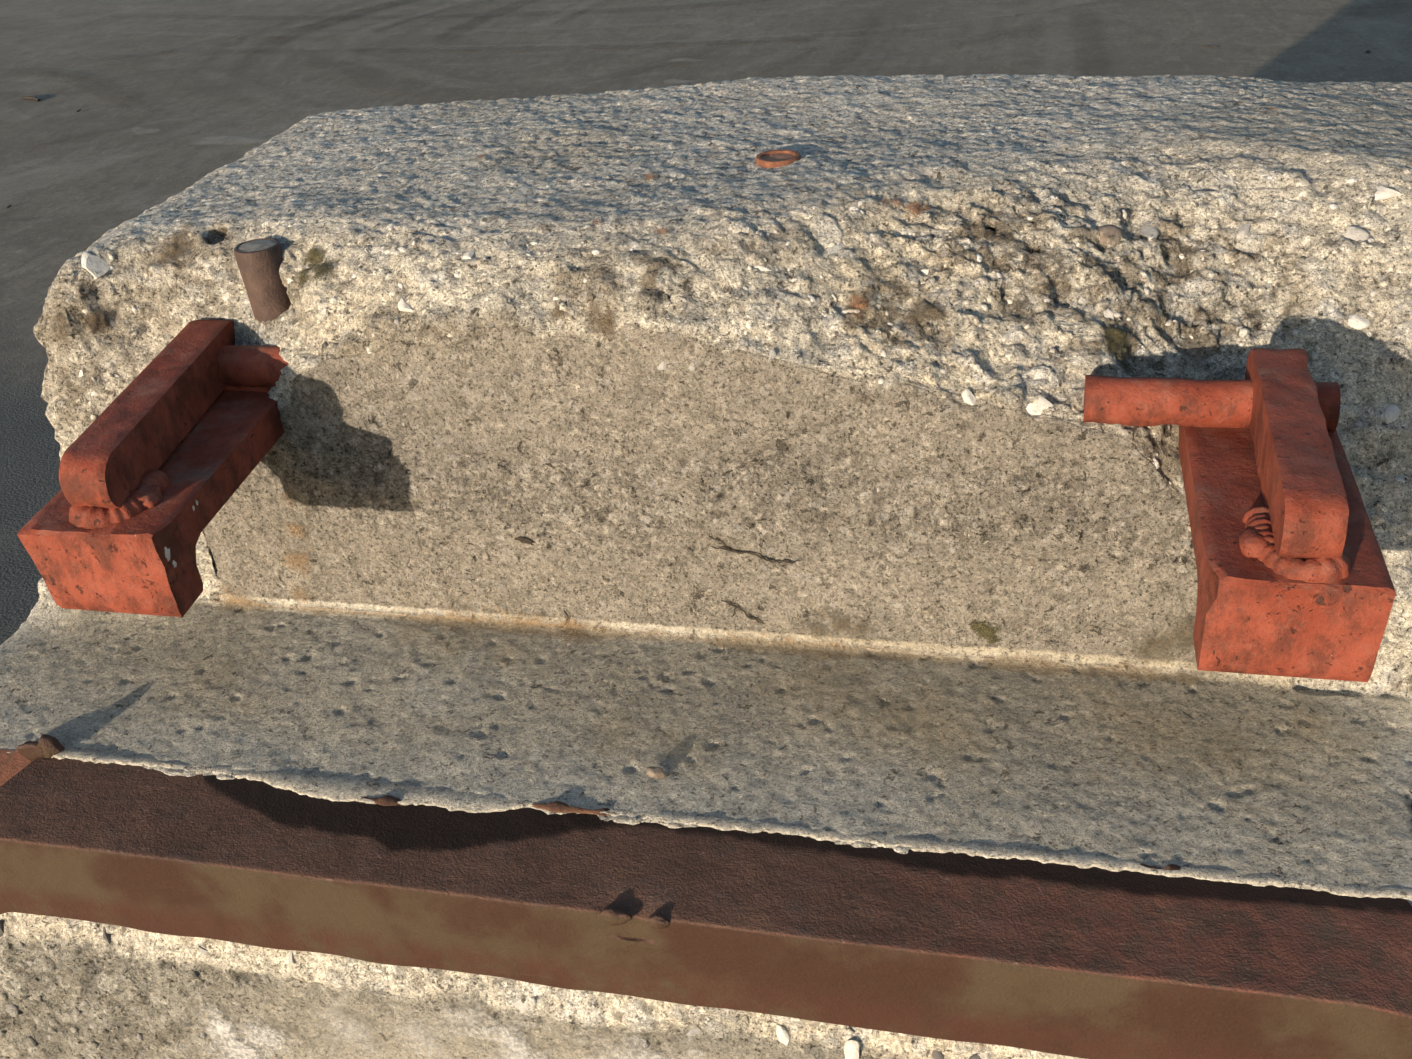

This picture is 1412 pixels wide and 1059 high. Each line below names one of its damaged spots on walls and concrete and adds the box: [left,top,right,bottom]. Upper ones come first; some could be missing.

corrosion [362,795,402,806]
corrosion [531,801,610,816]